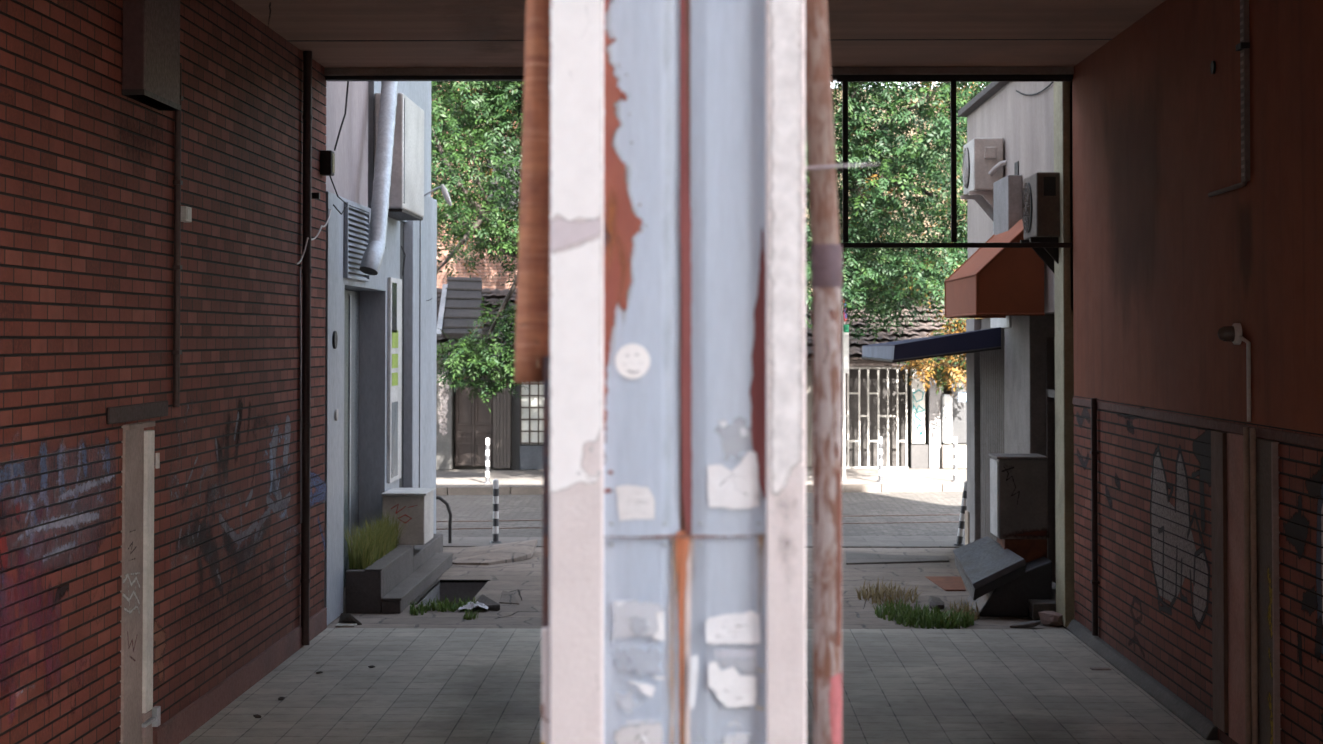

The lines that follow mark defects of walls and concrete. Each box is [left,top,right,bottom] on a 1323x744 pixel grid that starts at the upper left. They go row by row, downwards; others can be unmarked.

corrosion [604,0,766,744]
corrosion [812,297,829,524]